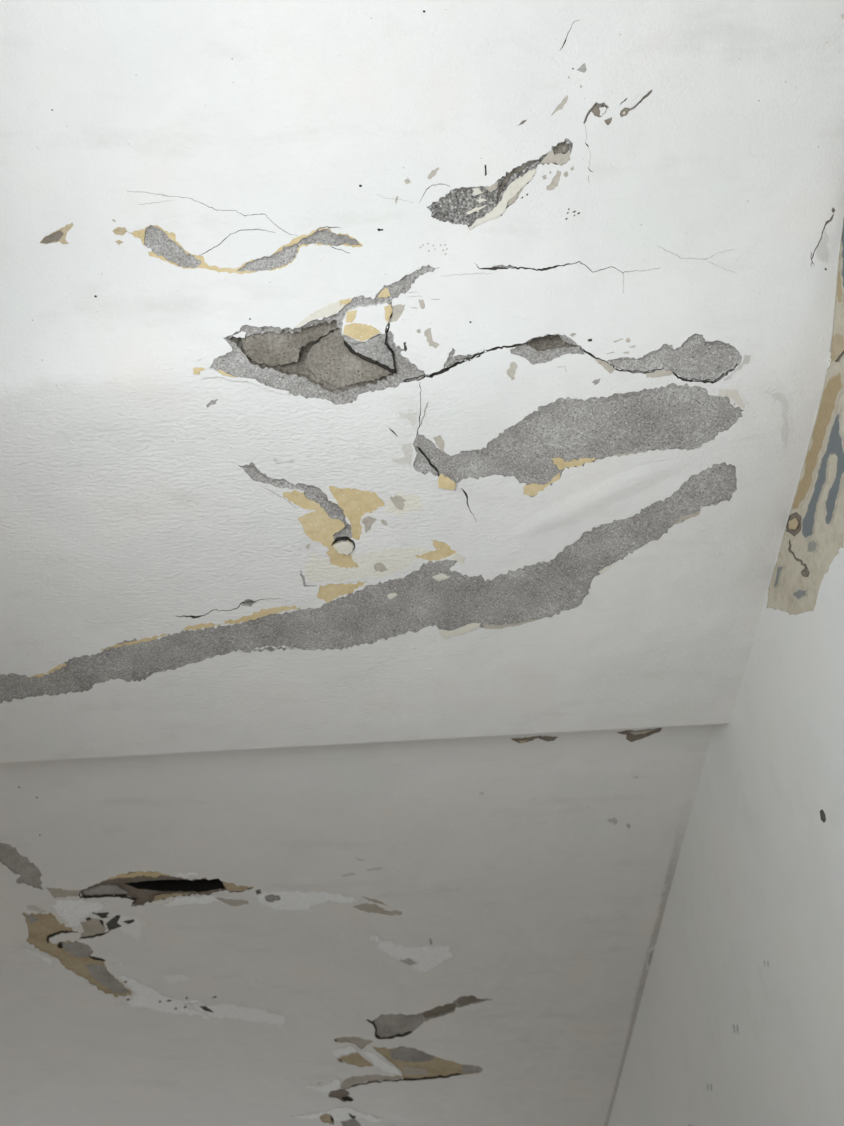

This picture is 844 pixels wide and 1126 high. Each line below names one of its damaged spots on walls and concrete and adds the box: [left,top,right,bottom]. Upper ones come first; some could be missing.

peeling [112,219,363,274]
spalling [427,138,574,230]
spalling [193,243,448,405]
spalling [389,333,754,497]
spalling [0,462,737,704]
spalling [616,728,662,742]
spalling [0,843,281,1001]
peeling [354,897,402,916]
spalling [289,995,492,1126]